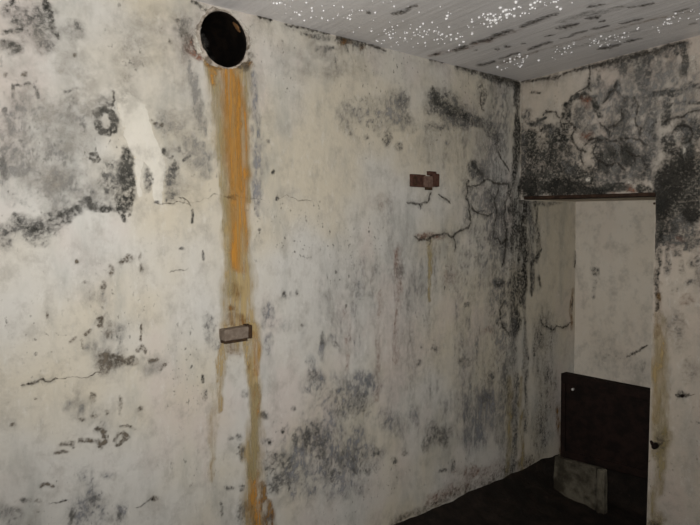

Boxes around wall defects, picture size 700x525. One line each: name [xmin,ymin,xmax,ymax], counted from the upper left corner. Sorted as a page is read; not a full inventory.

water stain [2,0,59,53]
water stain [0,101,37,178]
water stain [2,141,136,245]
water stain [67,92,119,136]
water stain [155,140,210,203]
water stain [188,60,201,121]
crack [412,151,508,264]
crack [543,83,646,170]
crack [665,110,697,158]
rust [185,37,274,525]
water stain [428,42,700,478]
water stain [265,373,379,497]